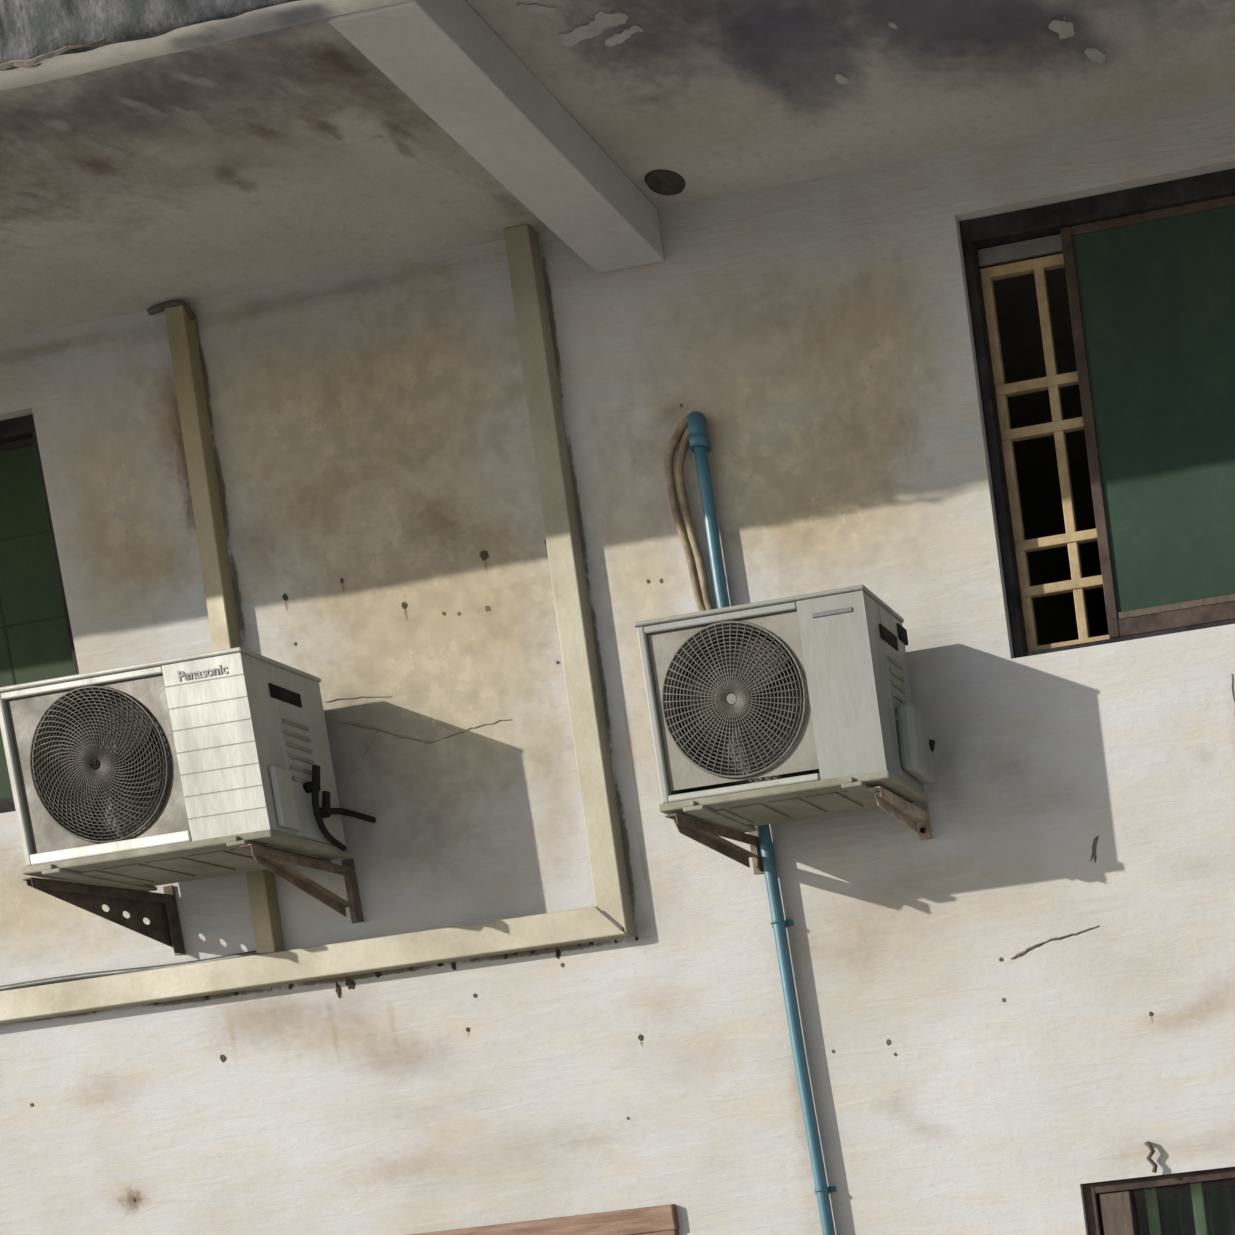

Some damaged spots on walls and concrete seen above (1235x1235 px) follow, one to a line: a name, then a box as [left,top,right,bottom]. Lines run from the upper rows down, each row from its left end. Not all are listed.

peeling [558,10,644,47]
peeling [1048,16,1075,39]
crack [323,696,512,757]
crack [1011,925,1099,959]